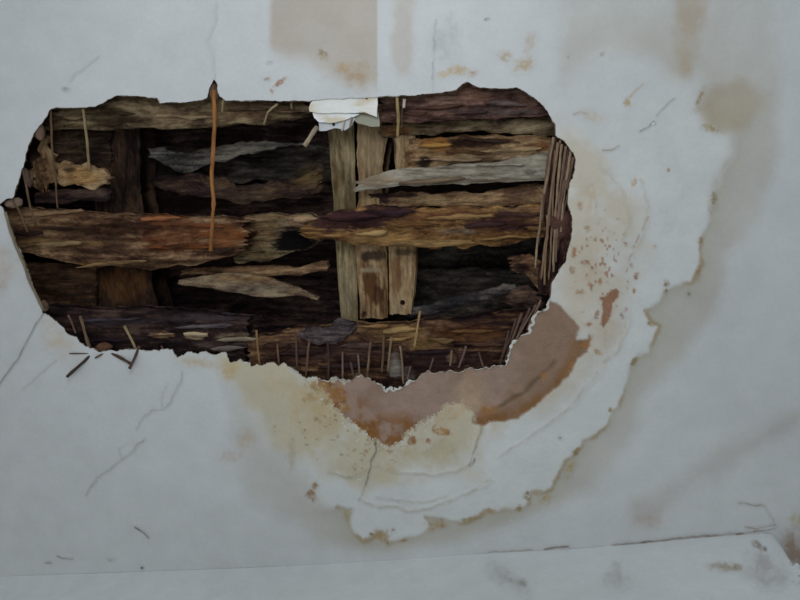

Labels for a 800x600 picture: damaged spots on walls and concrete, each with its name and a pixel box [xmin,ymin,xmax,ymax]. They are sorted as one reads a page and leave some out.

water stain [37,310,86,366]
spalling [0,80,629,448]
water stain [169,0,800,560]